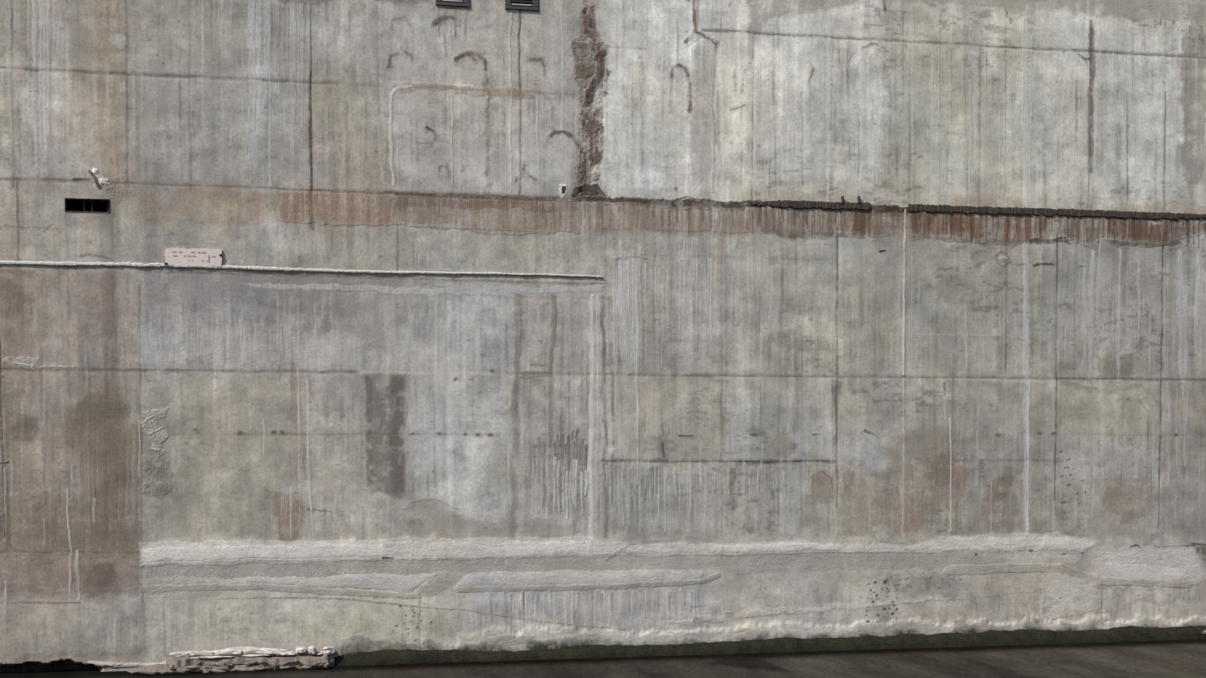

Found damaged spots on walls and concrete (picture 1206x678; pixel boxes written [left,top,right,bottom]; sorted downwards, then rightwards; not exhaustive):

water stain [26,0,61,151]
water stain [217,0,468,188]
spalling [558,0,611,198]
water stain [617,0,726,197]
water stain [744,0,866,203]
water stain [0,232,795,606]
corrosion [275,187,1206,283]
water stain [762,300,837,355]
water stain [795,0,1206,543]
water stain [0,628,155,668]
water stain [488,587,702,631]
water stain [1122,541,1206,625]